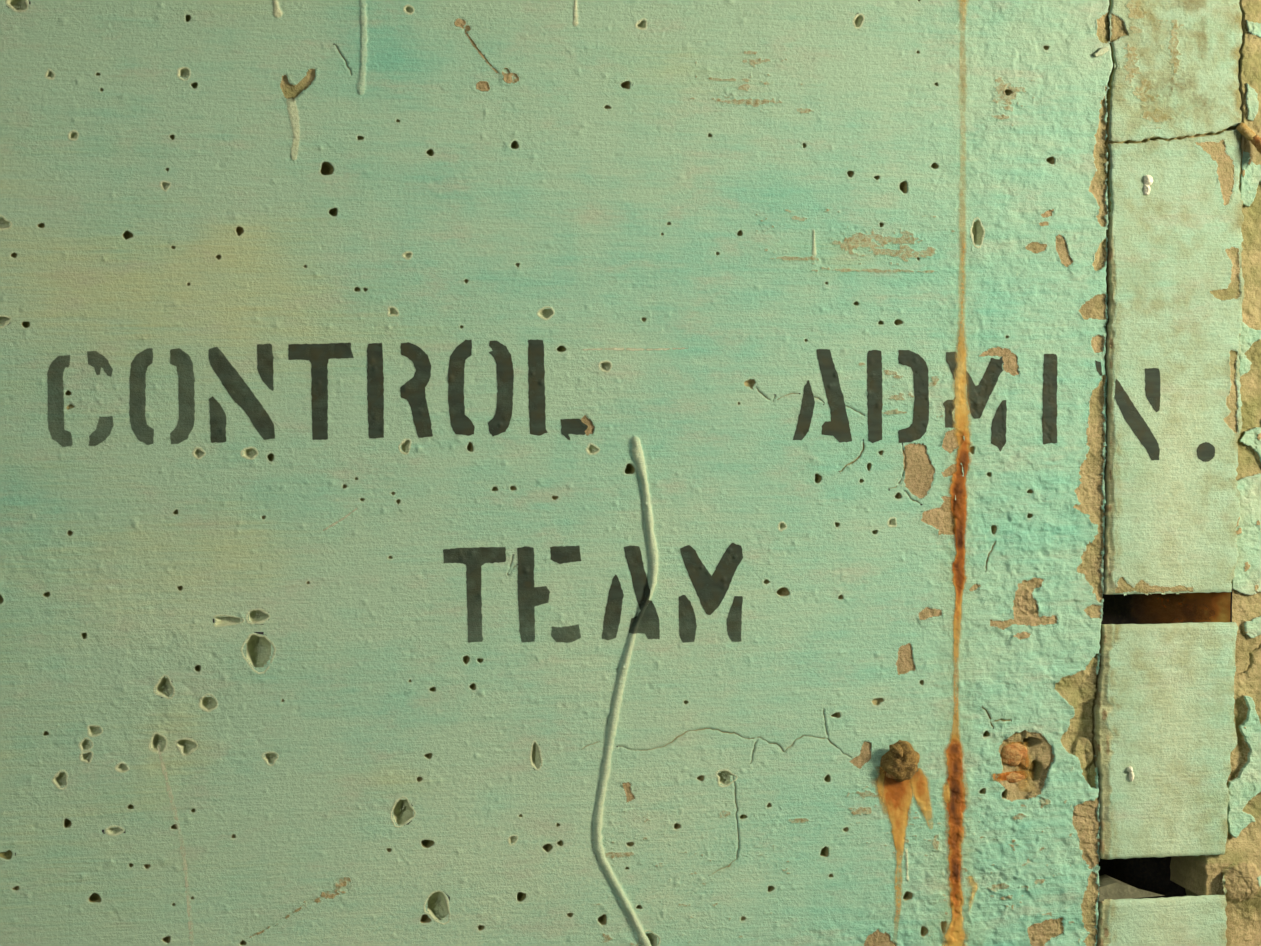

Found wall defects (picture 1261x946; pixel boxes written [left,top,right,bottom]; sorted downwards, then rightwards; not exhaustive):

peeling [1245,20,1261,37]
peeling [1245,83,1259,121]
spalling [1077,292,1108,355]
crack [1103,0,1244,586]
spalling [1071,374,1196,621]
peeling [1223,322,1261,595]
corrosion [876,243,978,946]
peeling [1243,616,1261,638]
corrosion [993,742,1030,781]
crack [1090,625,1103,856]
peeling [1226,695,1261,838]
crack [1094,901,1102,946]